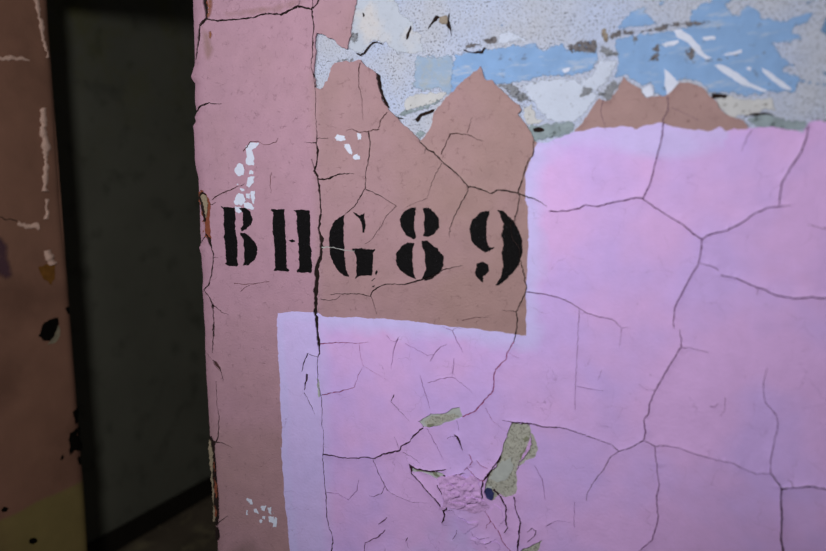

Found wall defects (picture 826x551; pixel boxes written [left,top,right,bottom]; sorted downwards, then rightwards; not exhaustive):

peeling [314,0,826,143]
crack [196,0,826,551]
spalling [39,317,60,344]
spalling [419,407,462,427]
spalling [484,423,538,526]